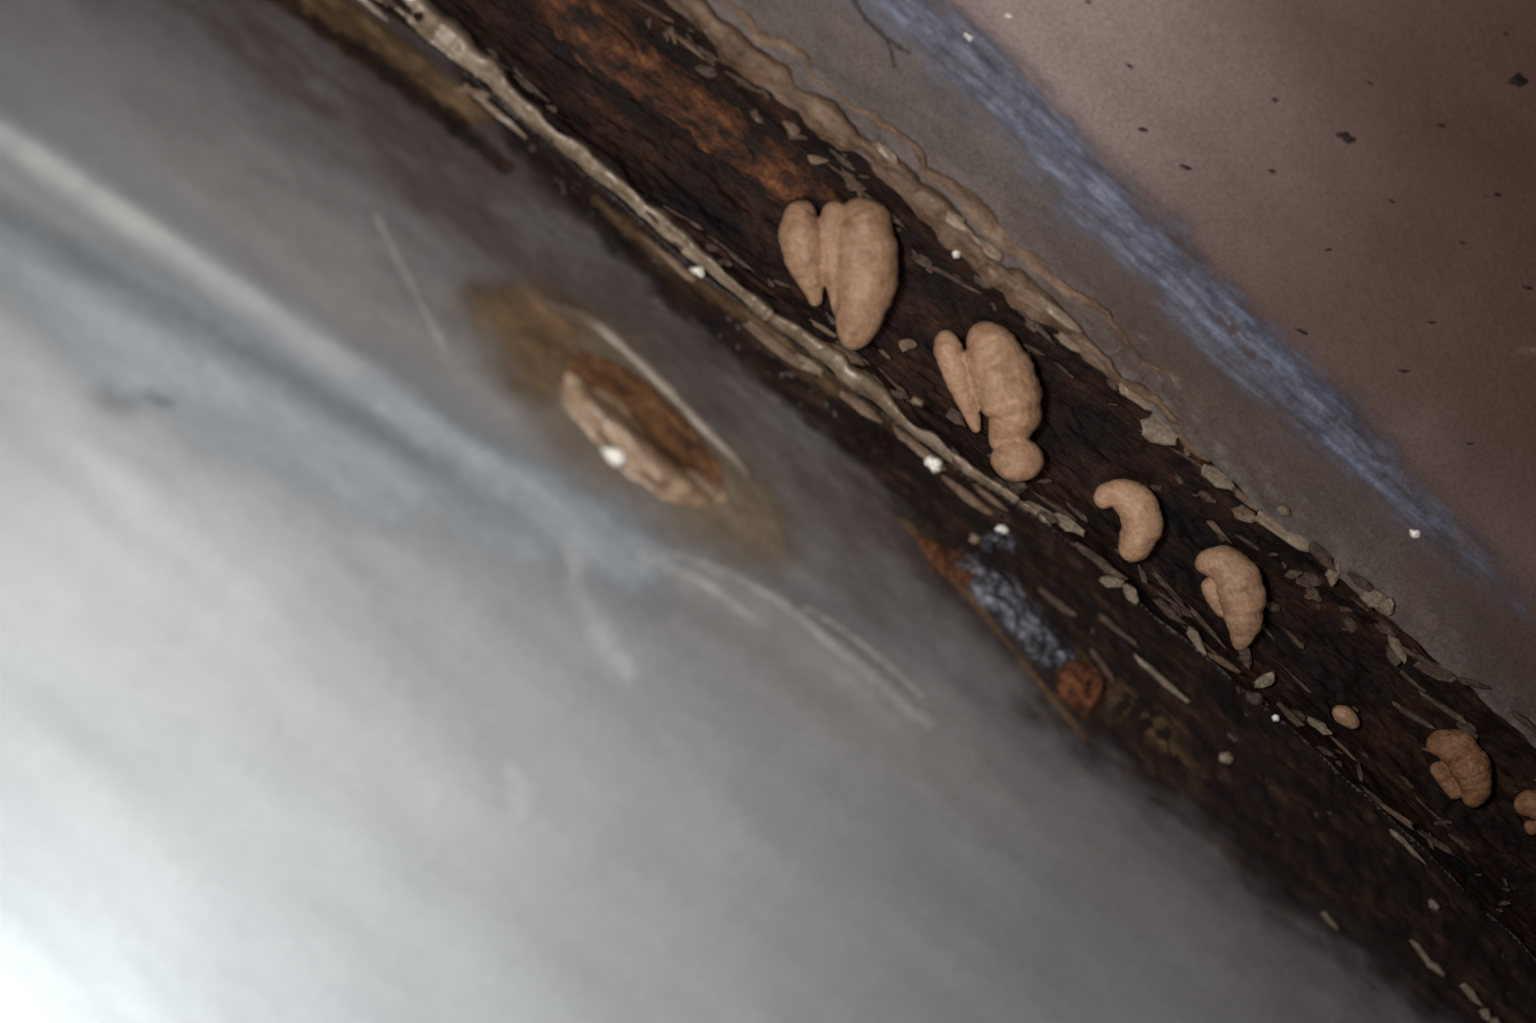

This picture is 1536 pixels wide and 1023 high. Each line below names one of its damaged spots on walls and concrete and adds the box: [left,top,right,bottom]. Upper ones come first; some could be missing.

rust [276,0,911,493]
rust [473,287,791,560]
peeling [360,0,1394,735]
damp [877,0,1399,504]
rust [855,436,1536,1023]
peeling [1321,911,1339,930]
peeling [1389,829,1428,867]
peeling [1388,635,1491,689]
peeling [1409,940,1501,1023]